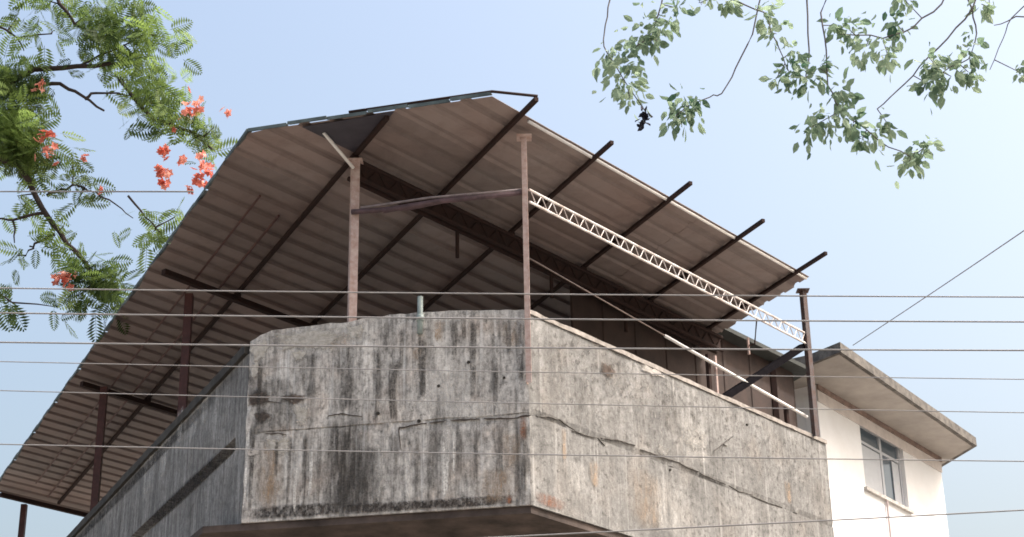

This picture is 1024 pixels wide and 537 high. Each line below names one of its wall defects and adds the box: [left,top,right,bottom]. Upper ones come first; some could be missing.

damp [375,336,403,418]
damp [418,341,444,403]
damp [451,323,476,381]
damp [243,364,290,507]
damp [275,424,462,509]
crack [398,415,782,508]